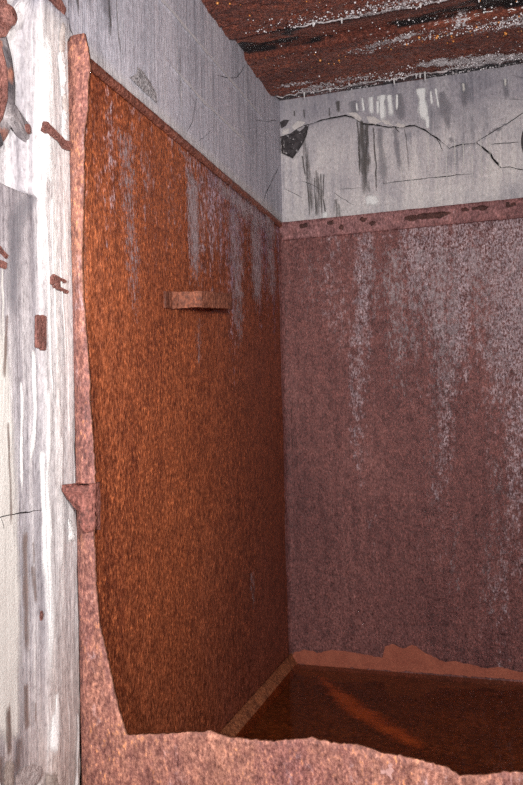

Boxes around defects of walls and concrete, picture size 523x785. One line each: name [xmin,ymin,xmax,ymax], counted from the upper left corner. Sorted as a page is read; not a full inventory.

water stain [348,32,441,54]
water stain [273,52,523,128]
spalling [280,120,309,158]
crack [259,98,523,170]
water stain [357,121,385,205]
crack [383,174,464,184]
rust [293,644,523,680]
spalling [3,760,62,785]